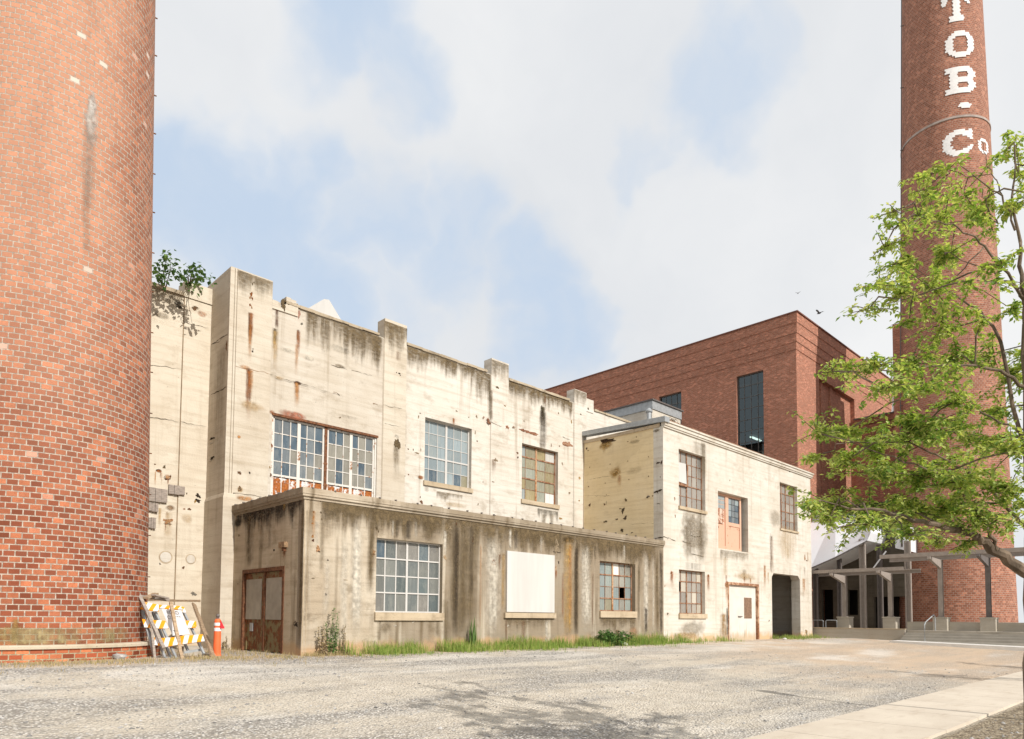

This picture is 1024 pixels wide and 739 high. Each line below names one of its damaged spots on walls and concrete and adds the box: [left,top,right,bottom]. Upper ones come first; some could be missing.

water stain [85,95,96,142]
water stain [308,313,505,415]
water stain [323,502,662,641]